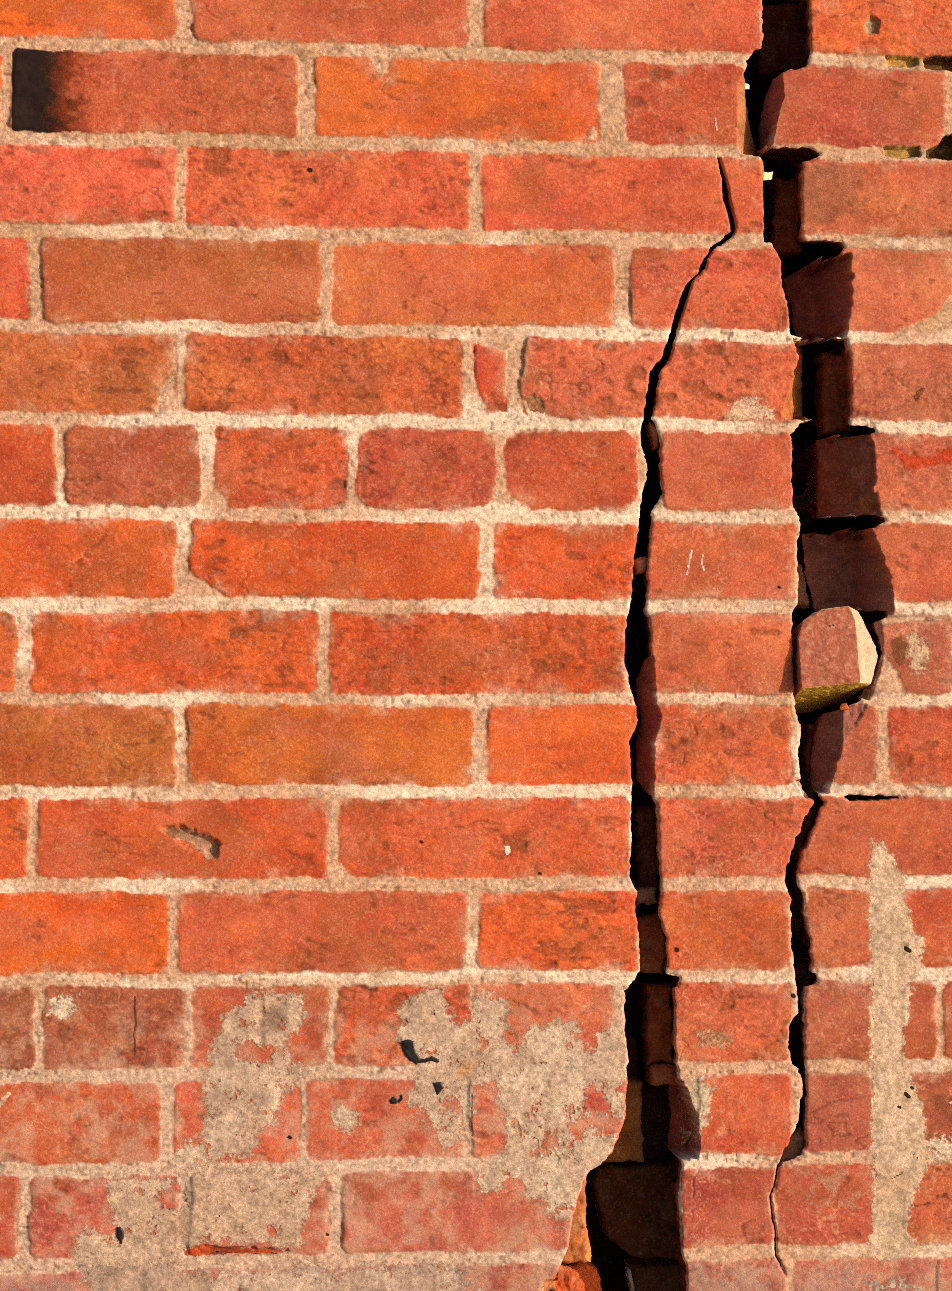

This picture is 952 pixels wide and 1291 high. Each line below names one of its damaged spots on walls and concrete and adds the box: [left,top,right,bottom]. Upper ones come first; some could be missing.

spalling [184,1244,284,1257]
crack [555,0,888,1291]